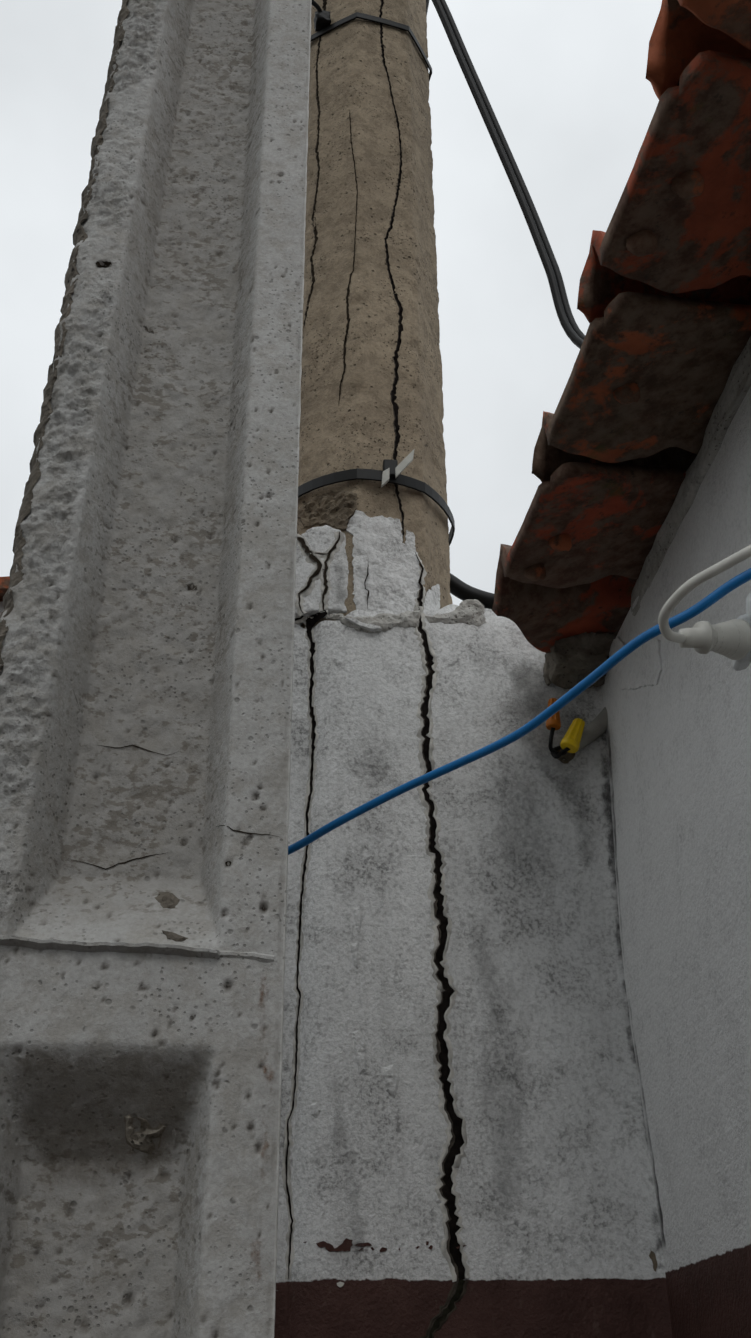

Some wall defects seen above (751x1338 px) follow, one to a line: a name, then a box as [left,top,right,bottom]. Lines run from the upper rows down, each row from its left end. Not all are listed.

crack [216,532,345,1280]
peeling [303,1238,400,1252]
crack [302,0,471,1338]